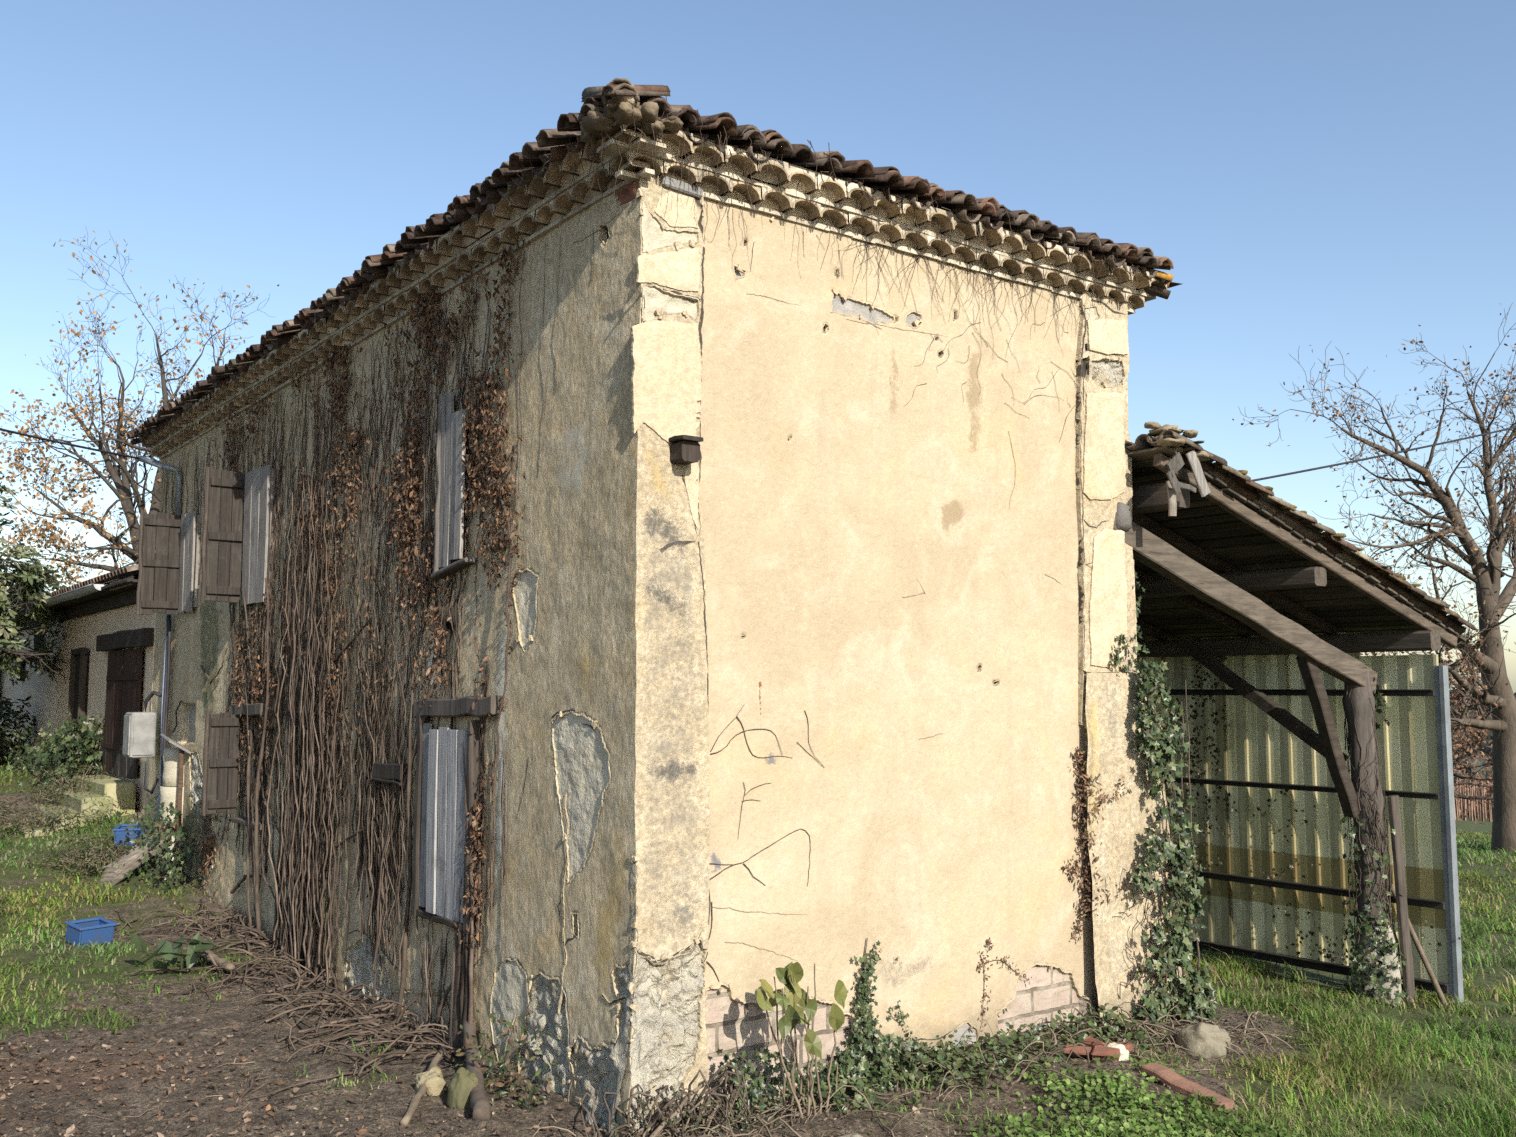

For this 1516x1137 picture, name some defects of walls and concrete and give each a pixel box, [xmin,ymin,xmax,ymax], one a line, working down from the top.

flaking render [642,285,701,323]
flaking render [822,268,923,333]
flaking render [552,711,611,884]
spalling [517,852,876,1137]
flaking render [950,1021,978,1048]
flaking render [995,962,1096,1039]